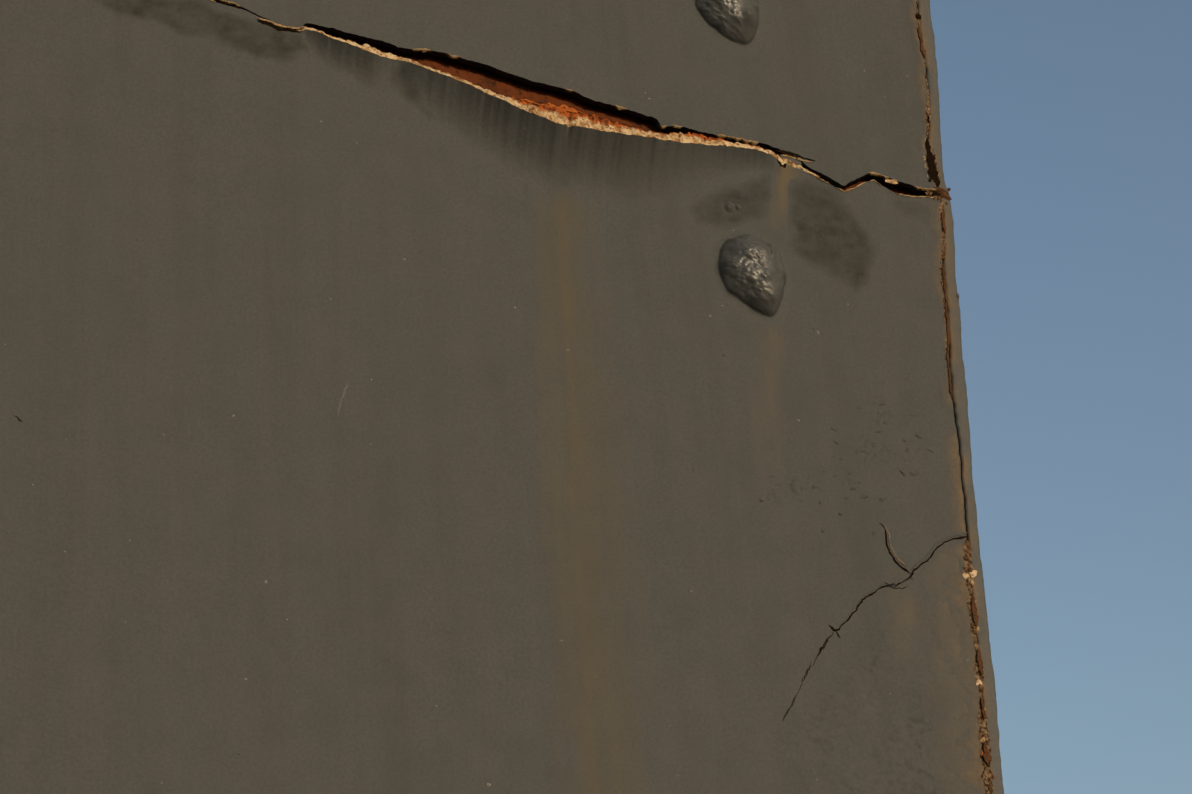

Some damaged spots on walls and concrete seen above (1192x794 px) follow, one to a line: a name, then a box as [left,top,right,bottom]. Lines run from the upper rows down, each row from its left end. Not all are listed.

crack [210,0,306,32]
rust [318,30,688,134]
water stain [687,173,772,230]
water stain [786,176,881,295]
crack [783,523,968,721]
rust [943,429,995,794]